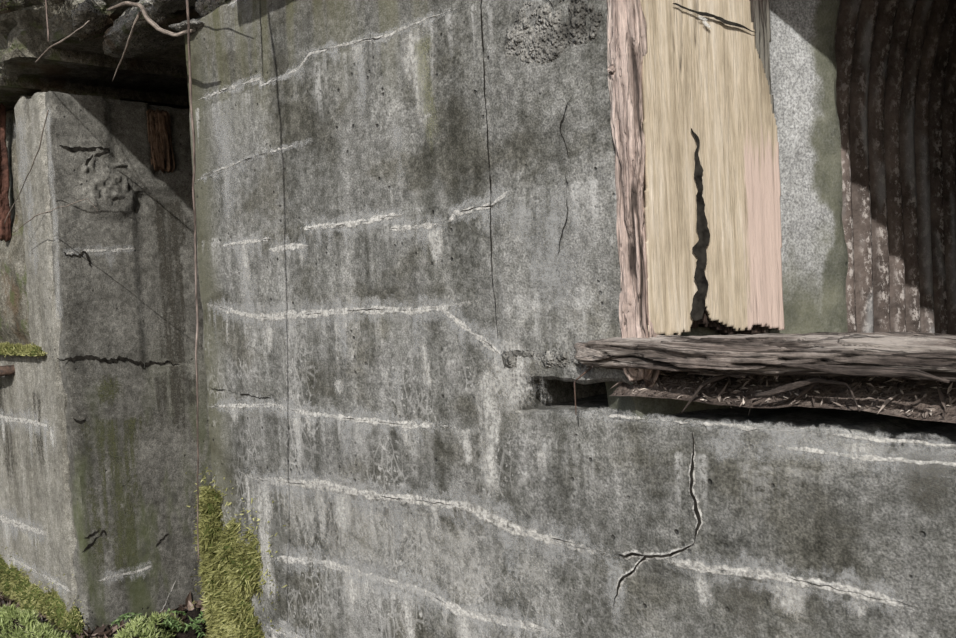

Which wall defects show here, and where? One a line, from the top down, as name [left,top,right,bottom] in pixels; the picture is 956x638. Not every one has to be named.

crack [60,145,109,166]
crack [57,355,179,368]
crack [537,432,741,606]
crack [791,578,914,607]